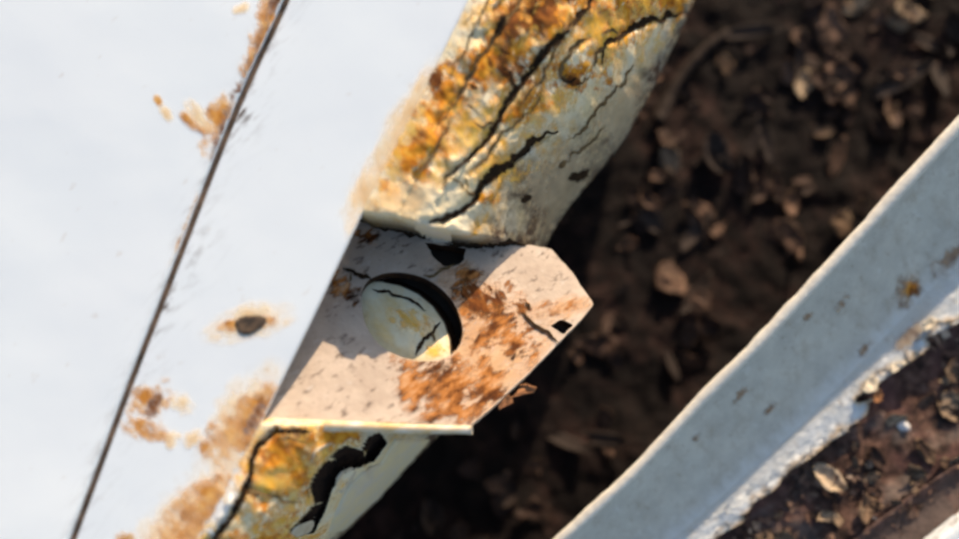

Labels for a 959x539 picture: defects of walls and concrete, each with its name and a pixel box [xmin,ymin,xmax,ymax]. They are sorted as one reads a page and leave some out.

rust [154,0,281,159]
rust [353,0,688,207]
crack [379,0,685,278]
rust [124,386,186,447]
rust [152,383,361,539]
crack [213,428,311,539]
crack [343,268,441,355]
rust [389,263,582,424]
crack [521,302,559,343]
peeling [862,375,883,404]
peeling [890,361,906,374]
peeling [922,317,937,332]